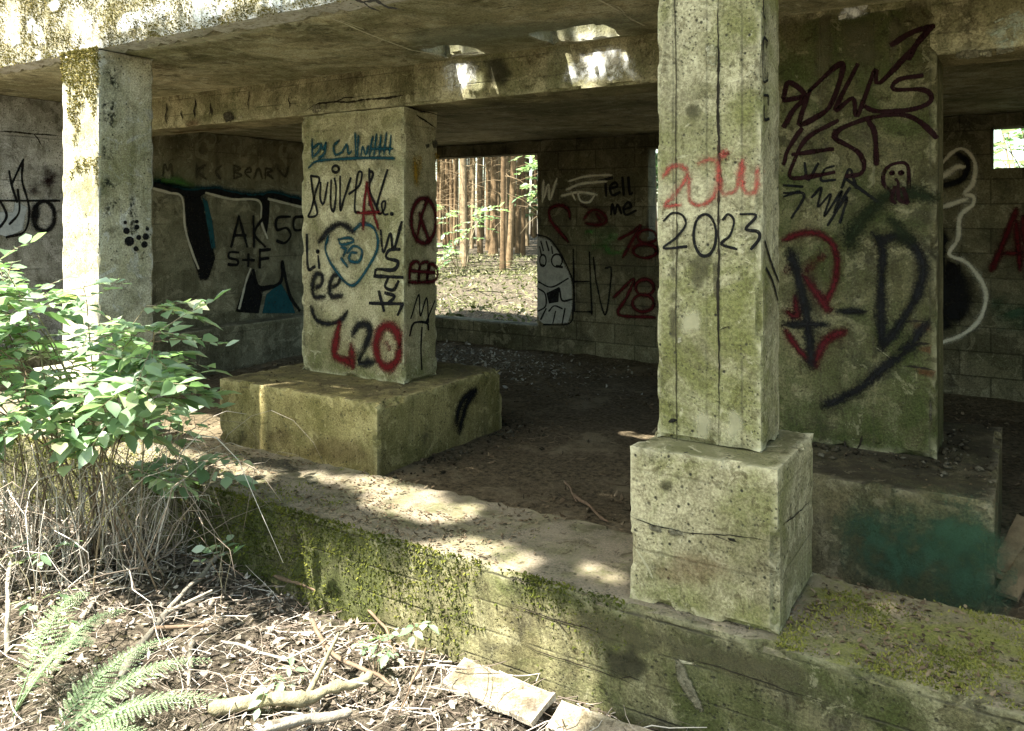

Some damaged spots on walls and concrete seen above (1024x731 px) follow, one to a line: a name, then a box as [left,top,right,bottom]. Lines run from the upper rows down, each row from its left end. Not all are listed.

crack [288,95,437,129]
crack [716,10,729,446]
crack [626,502,809,545]